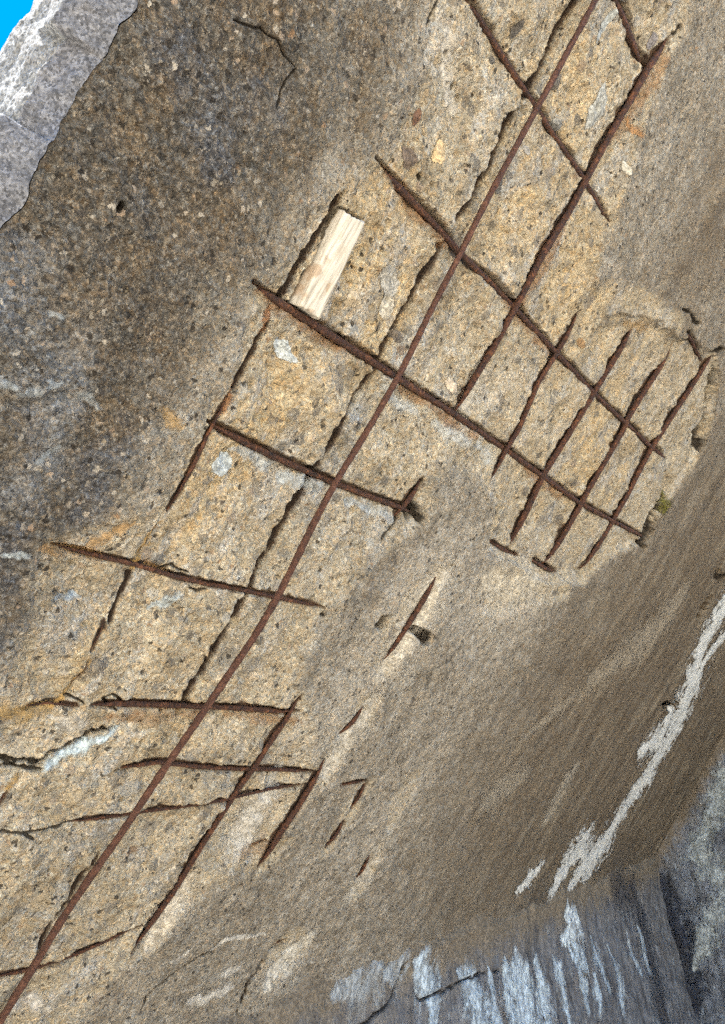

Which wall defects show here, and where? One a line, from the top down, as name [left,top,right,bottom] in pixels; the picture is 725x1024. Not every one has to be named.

crack [232,17,298,112]
spalling [310,0,720,620]
spalling [0,199,422,1024]
spalling [371,563,450,678]
water stain [544,595,725,902]
crack [0,819,71,844]
water stain [515,860,545,895]
water stain [660,764,725,1018]
water stain [456,957,515,1024]
water stain [534,955,553,1024]
water stain [568,935,611,1014]
water stain [614,878,666,1023]